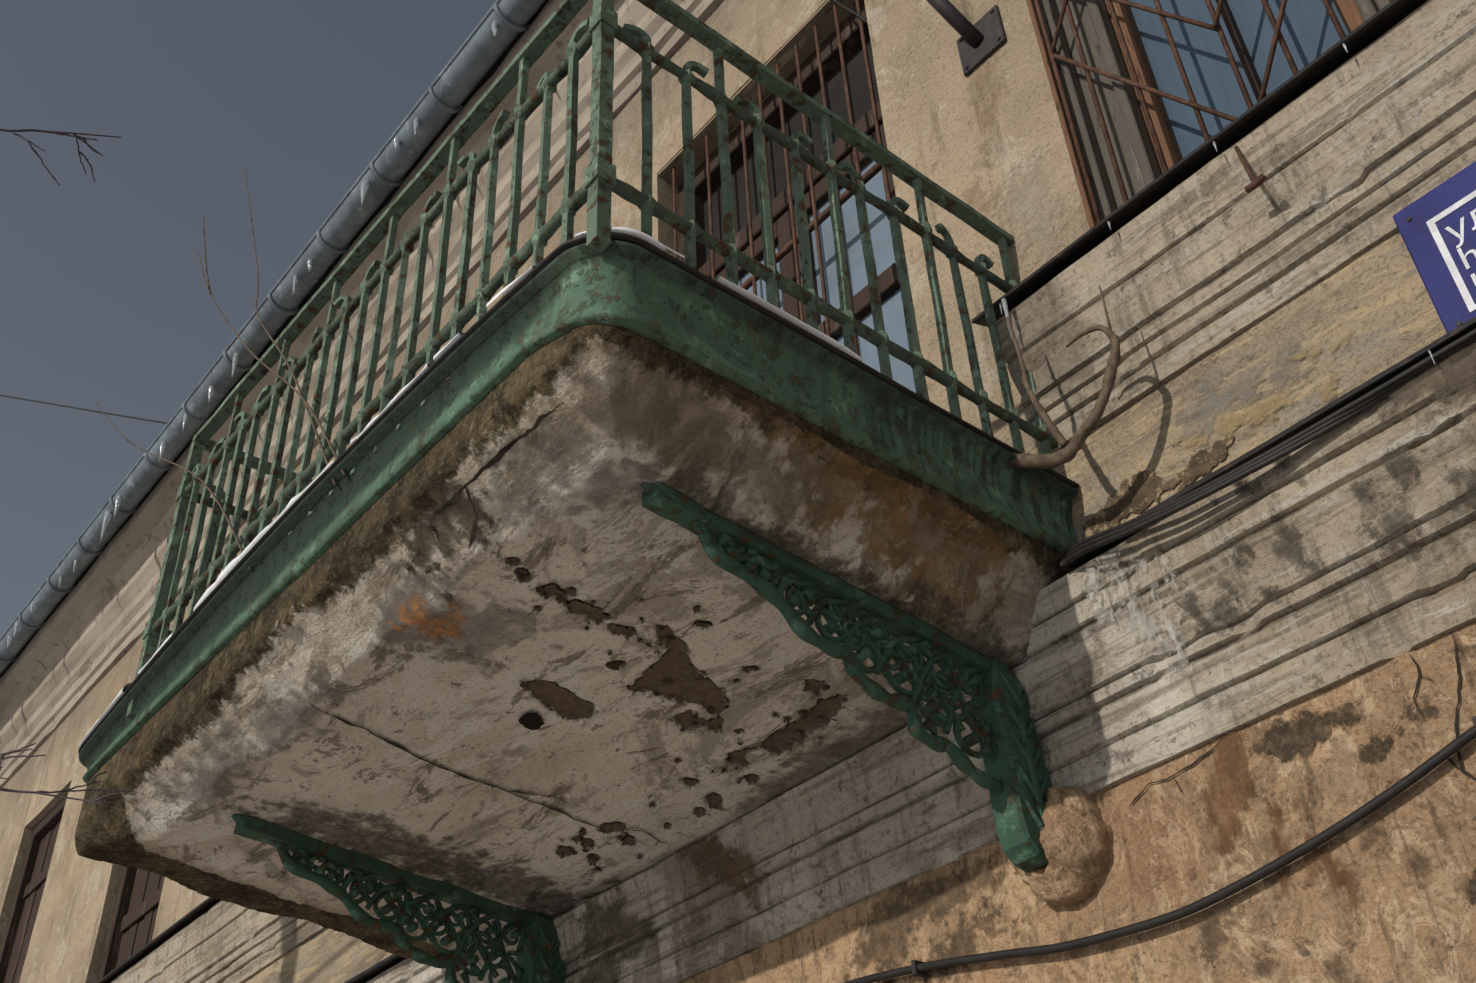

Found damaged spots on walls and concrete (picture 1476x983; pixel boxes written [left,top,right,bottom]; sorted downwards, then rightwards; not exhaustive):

crack [430,402,564,549]
corrosion [390,593,467,639]
crack [309,702,668,846]
peeling [556,822,642,871]
spalling [391,468,848,819]
crack [1410,634,1476,781]